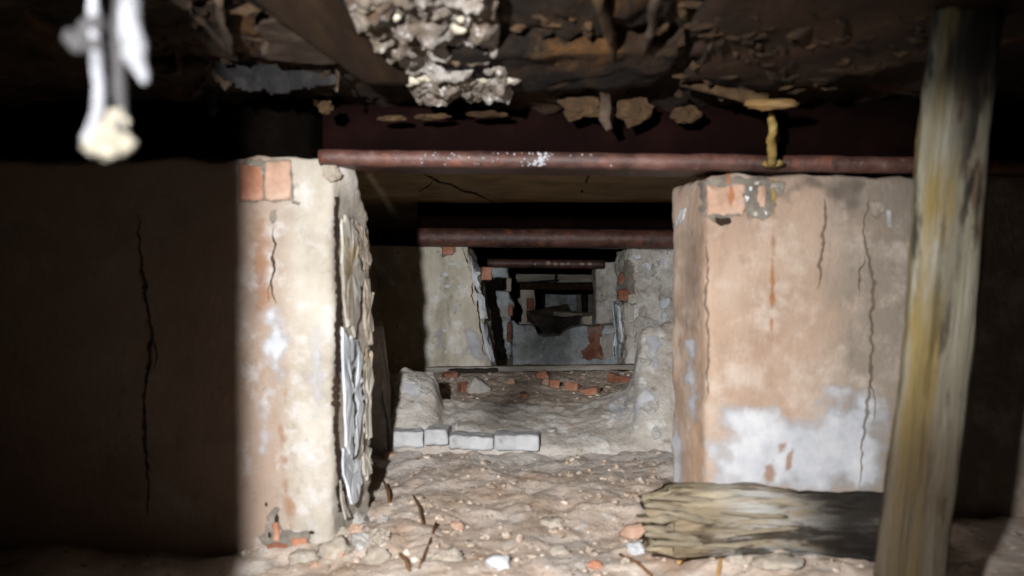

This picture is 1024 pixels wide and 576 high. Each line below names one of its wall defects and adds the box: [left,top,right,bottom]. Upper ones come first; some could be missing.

spalling [239,159,300,225]
crack [267,226,277,304]
spalling [698,175,785,226]
crack [817,198,827,288]
crack [137,214,158,516]
peeling [339,214,374,519]
damp [393,374,431,398]
damp [600,336,886,491]
crack [857,197,876,490]
spalling [261,503,314,549]